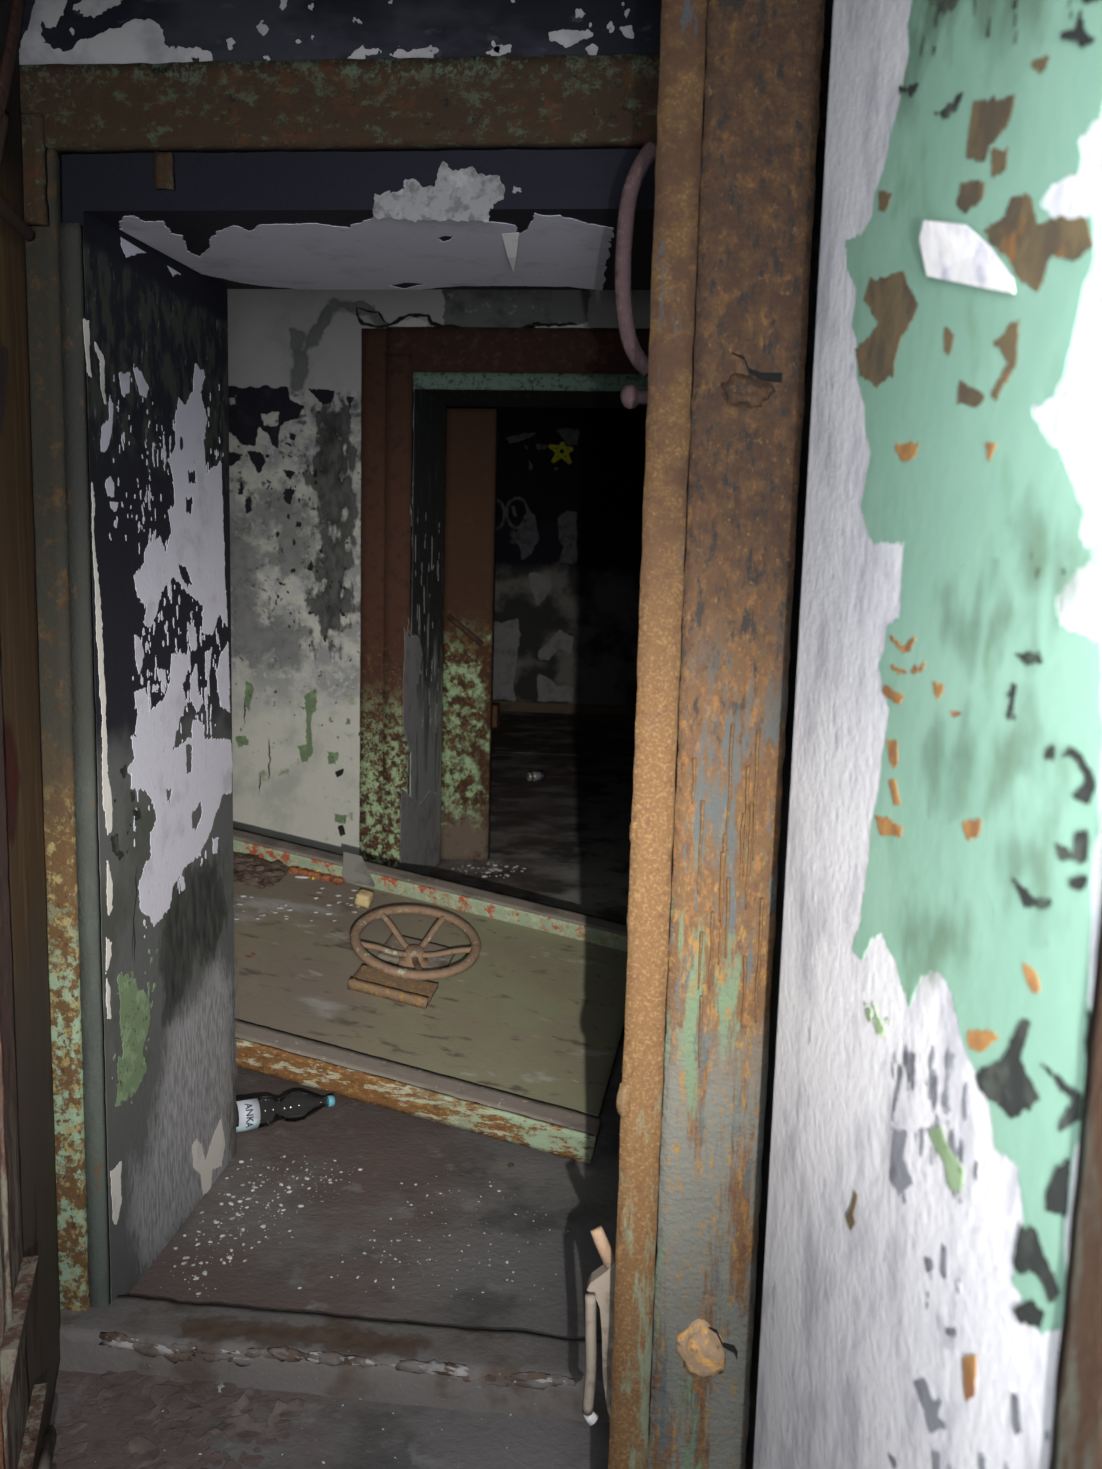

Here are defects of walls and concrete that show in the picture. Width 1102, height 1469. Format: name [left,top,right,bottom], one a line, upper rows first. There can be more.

peeling [19,0,235,65]
peeling [347,45,439,59]
peeling [549,2,634,55]
peeling [119,161,614,290]
peeling [845,0,1102,1335]
peeling [83,318,355,1107]
corrosion [692,758,705,895]
corrosion [626,910,637,934]
corrosion [698,724,764,1068]
corrosion [616,1055,634,1119]
peeling [110,1161,122,1225]
corrosion [615,1208,631,1264]